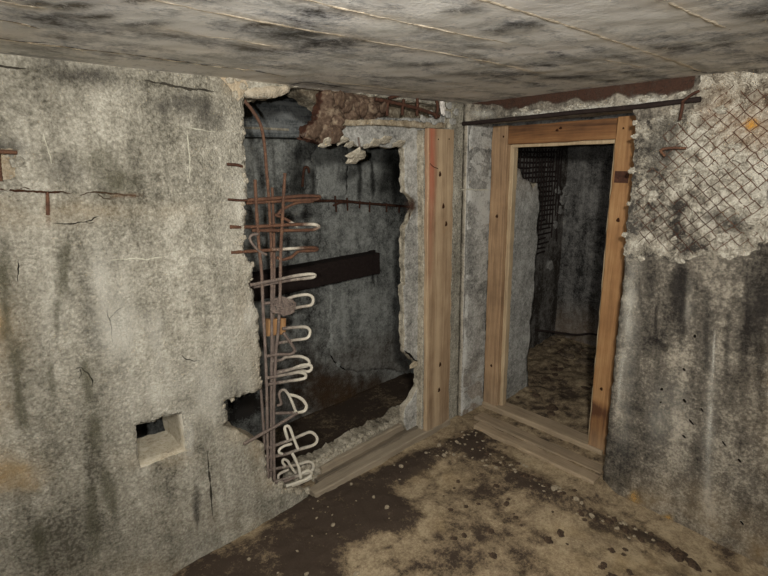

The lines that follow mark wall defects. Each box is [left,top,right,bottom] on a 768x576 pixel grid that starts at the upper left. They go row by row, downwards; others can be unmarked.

damp [27,2,111,18]
damp [486,22,543,32]
crack [0,20,341,87]
crack [145,80,217,92]
spalling [359,96,459,125]
spalling [0,148,27,195]
spalling [621,71,768,264]
crack [0,187,136,225]
peeling [220,77,411,495]
damp [670,270,686,333]